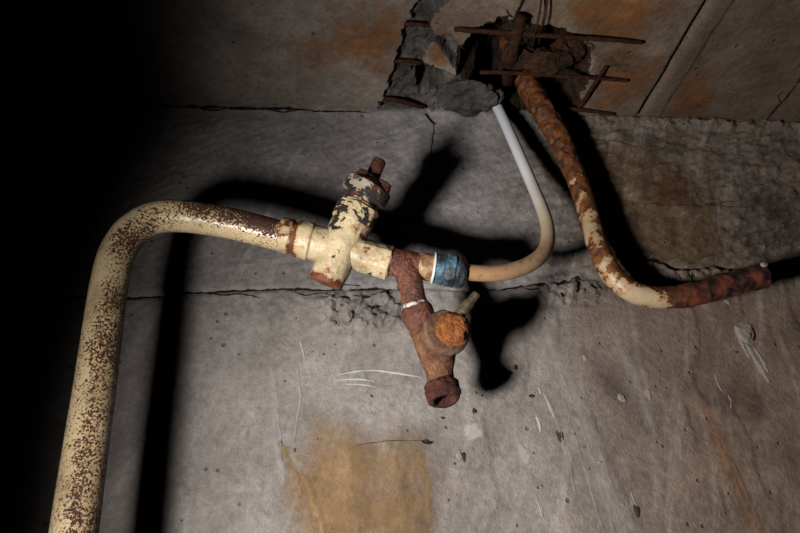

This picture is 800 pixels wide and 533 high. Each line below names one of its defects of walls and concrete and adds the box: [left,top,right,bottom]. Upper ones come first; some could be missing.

spalling [377,0,531,114]
spalling [522,23,595,115]
corrosion [598,53,655,107]
crack [55,102,367,113]
crack [126,284,392,303]
spalling [314,287,405,336]
crack [489,283,545,291]
corrosion [280,429,432,533]